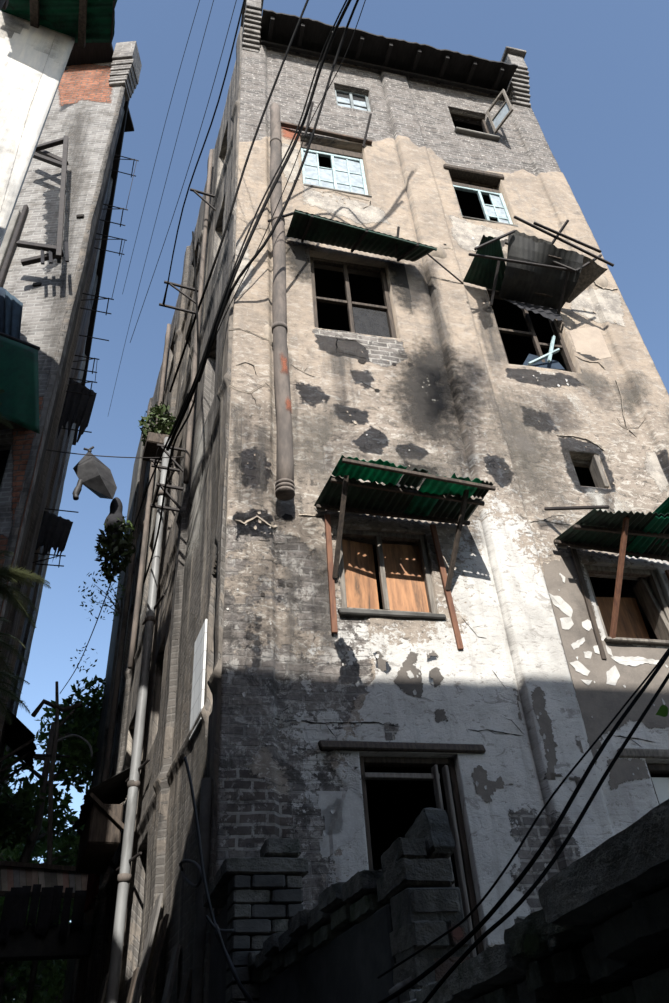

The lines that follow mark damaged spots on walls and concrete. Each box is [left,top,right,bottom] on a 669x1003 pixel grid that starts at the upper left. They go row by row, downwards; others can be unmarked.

spalling [281,143,390,225]
crack [575,355,644,437]
crack [556,434,605,451]
peeling [375,649,444,697]
peeling [542,555,669,790]
peeling [531,687,580,786]
peeling [471,765,514,803]
flaking render [508,802,581,923]